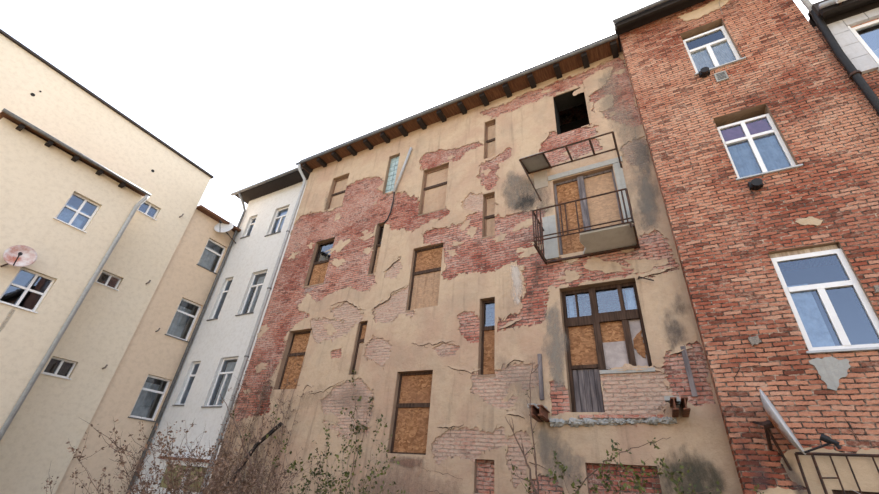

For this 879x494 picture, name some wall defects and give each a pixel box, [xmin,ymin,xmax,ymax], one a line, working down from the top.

spalling [419,142,483,170]
spalling [480,57,642,169]
spalling [235,148,680,422]
spalling [321,378,374,439]